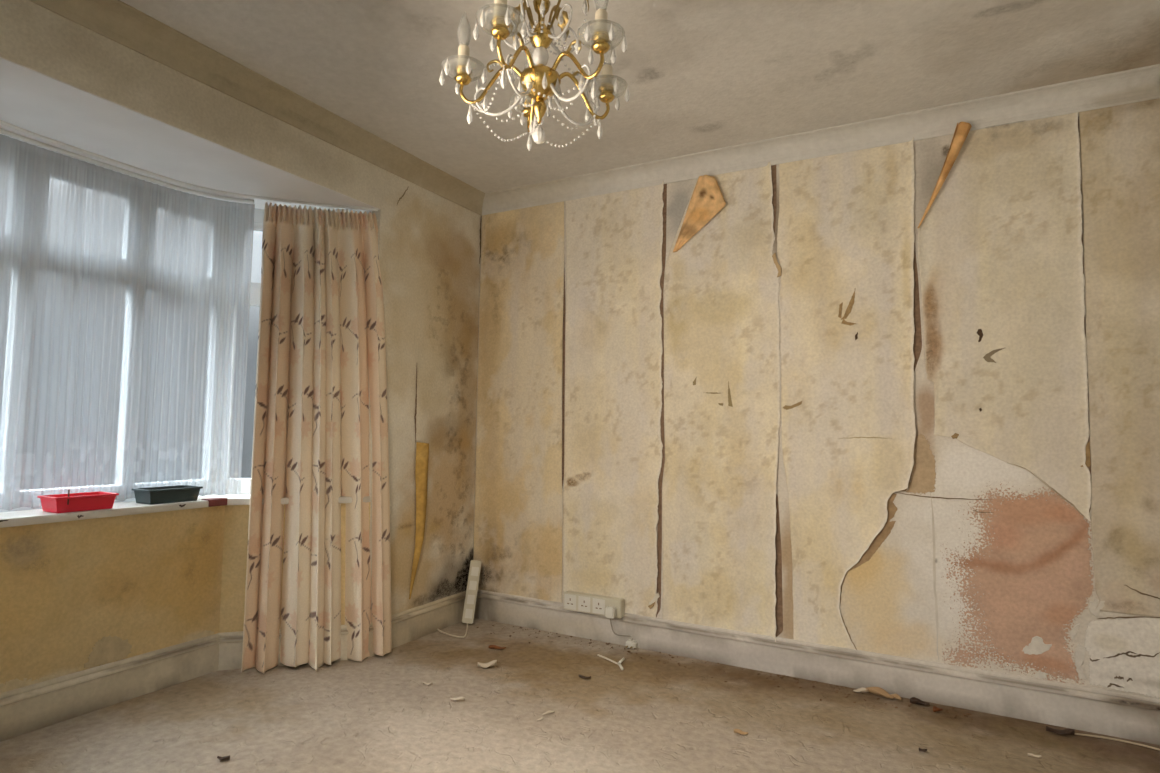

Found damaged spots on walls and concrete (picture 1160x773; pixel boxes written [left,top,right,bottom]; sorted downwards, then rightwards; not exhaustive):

peeling [672,175,726,253]
peeling [918,122,972,228]
peeling [409,442,429,599]
damp [430,550,487,601]
flaking render [940,481,1094,684]